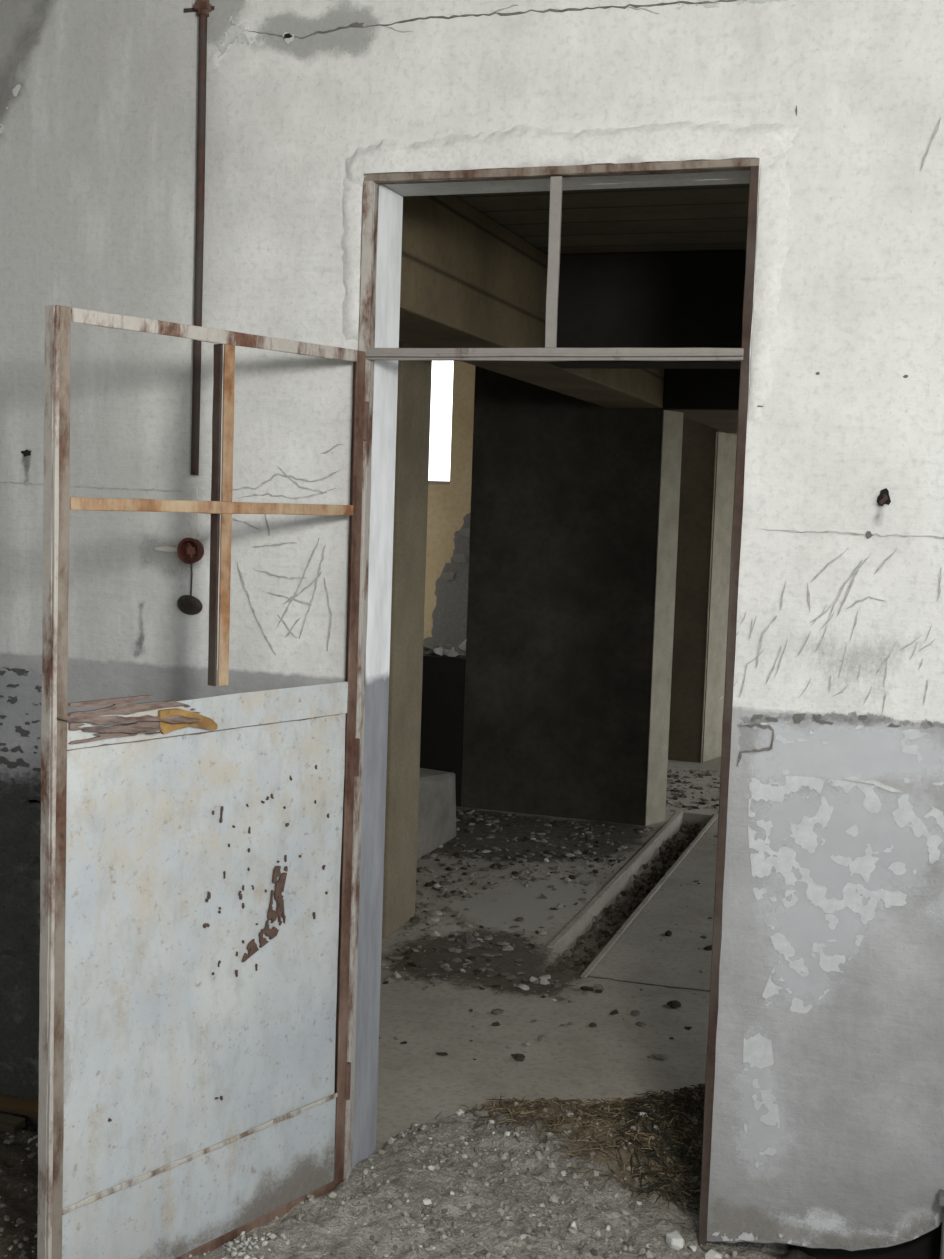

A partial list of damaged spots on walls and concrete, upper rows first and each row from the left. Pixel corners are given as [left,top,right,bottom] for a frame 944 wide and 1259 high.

peeling [0,0,47,134]
crack [246,0,787,39]
peeling [431,513,470,655]
peeling [0,667,42,805]
peeling [739,712,944,1013]
peeling [743,1033,780,1133]
spalling [712,1203,943,1248]